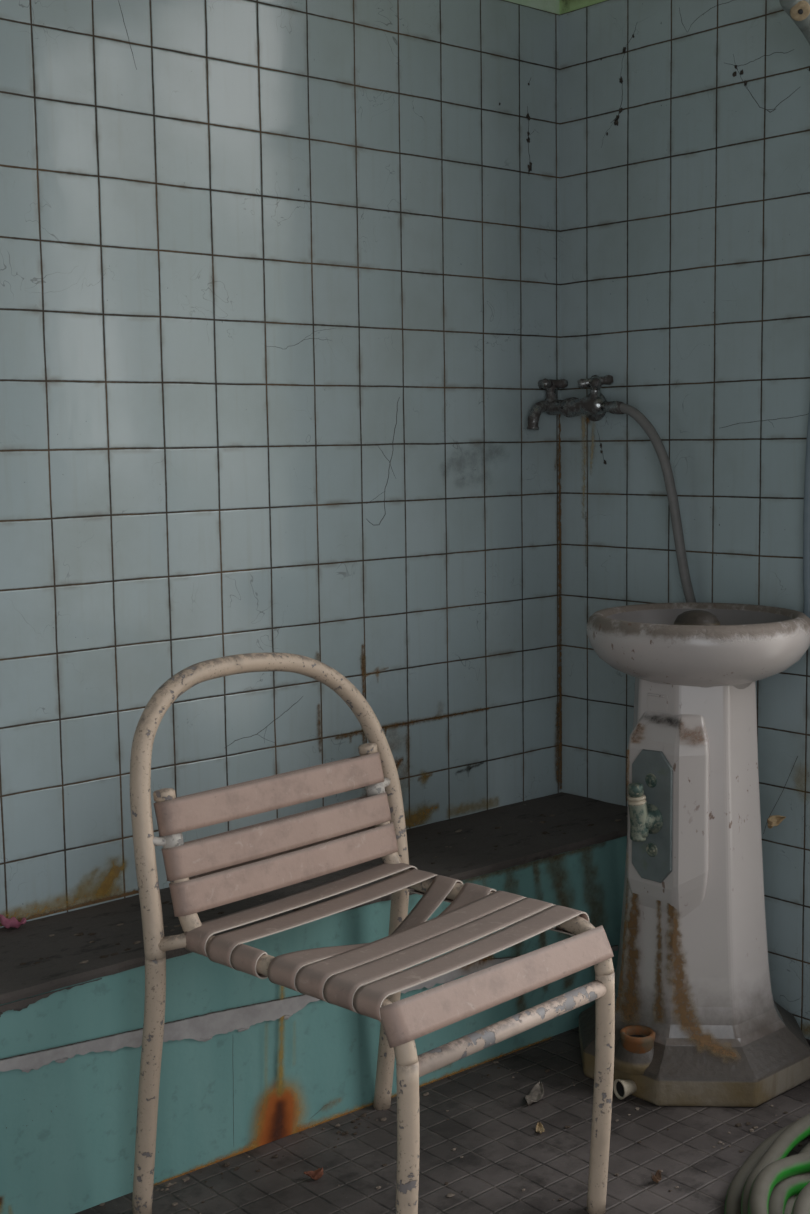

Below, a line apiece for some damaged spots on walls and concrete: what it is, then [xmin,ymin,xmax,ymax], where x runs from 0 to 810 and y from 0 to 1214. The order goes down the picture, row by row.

corrosion [362,645,378,697]
corrosion [318,705,366,752]
corrosion [382,708,489,732]
peeling [0,978,102,1017]
peeling [163,994,320,1042]
peeling [401,956,517,994]
corrosion [615,880,738,1058]
peeling [0,1028,143,1073]
corrosion [156,1016,373,1184]